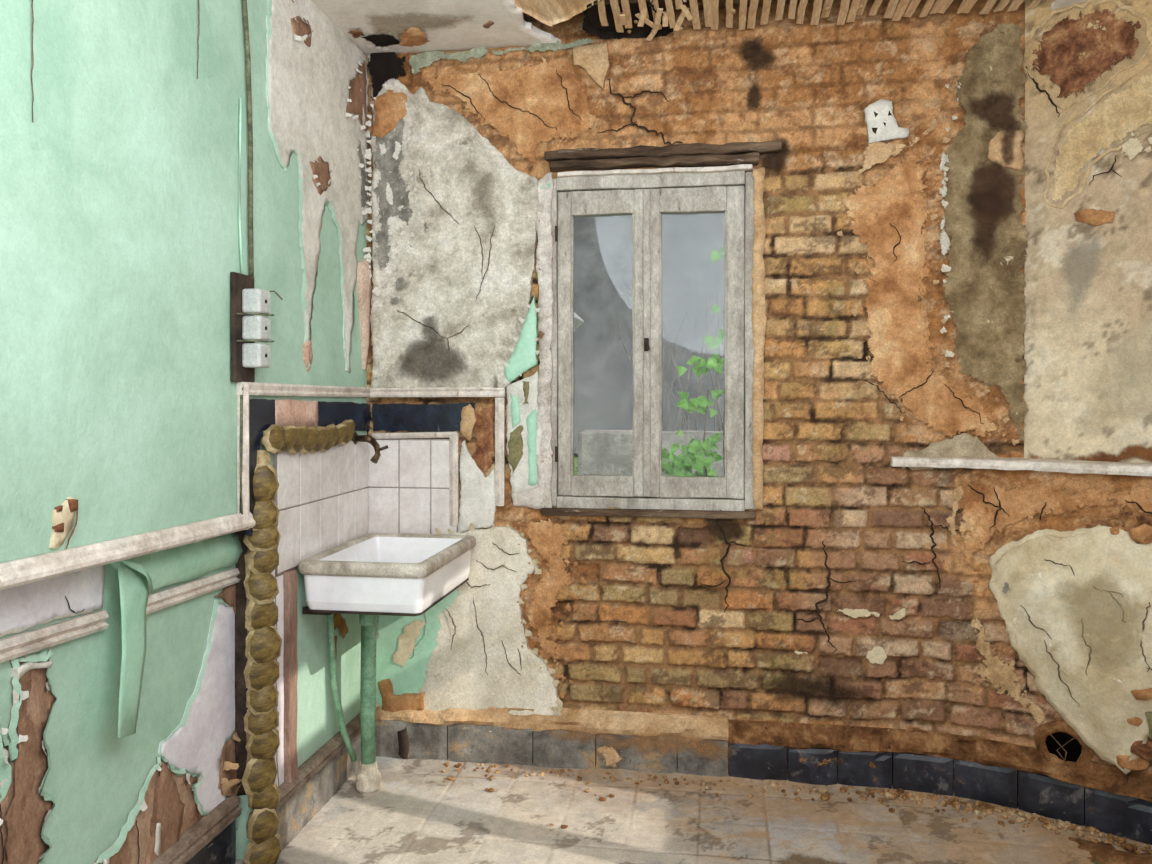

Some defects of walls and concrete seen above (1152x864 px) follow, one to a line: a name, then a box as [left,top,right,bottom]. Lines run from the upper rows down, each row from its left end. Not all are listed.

crack [600,79,683,145]
damp [969,93,1018,260]
damp [401,318,463,378]
spalling [265,0,610,716]
peeling [0,647,57,864]
peeling [93,584,242,864]
peeling [272,569,284,787]
crack [699,510,752,612]
crack [794,541,856,653]
spalling [837,607,906,620]
spalling [967,610,1094,768]
spalling [946,479,1152,569]